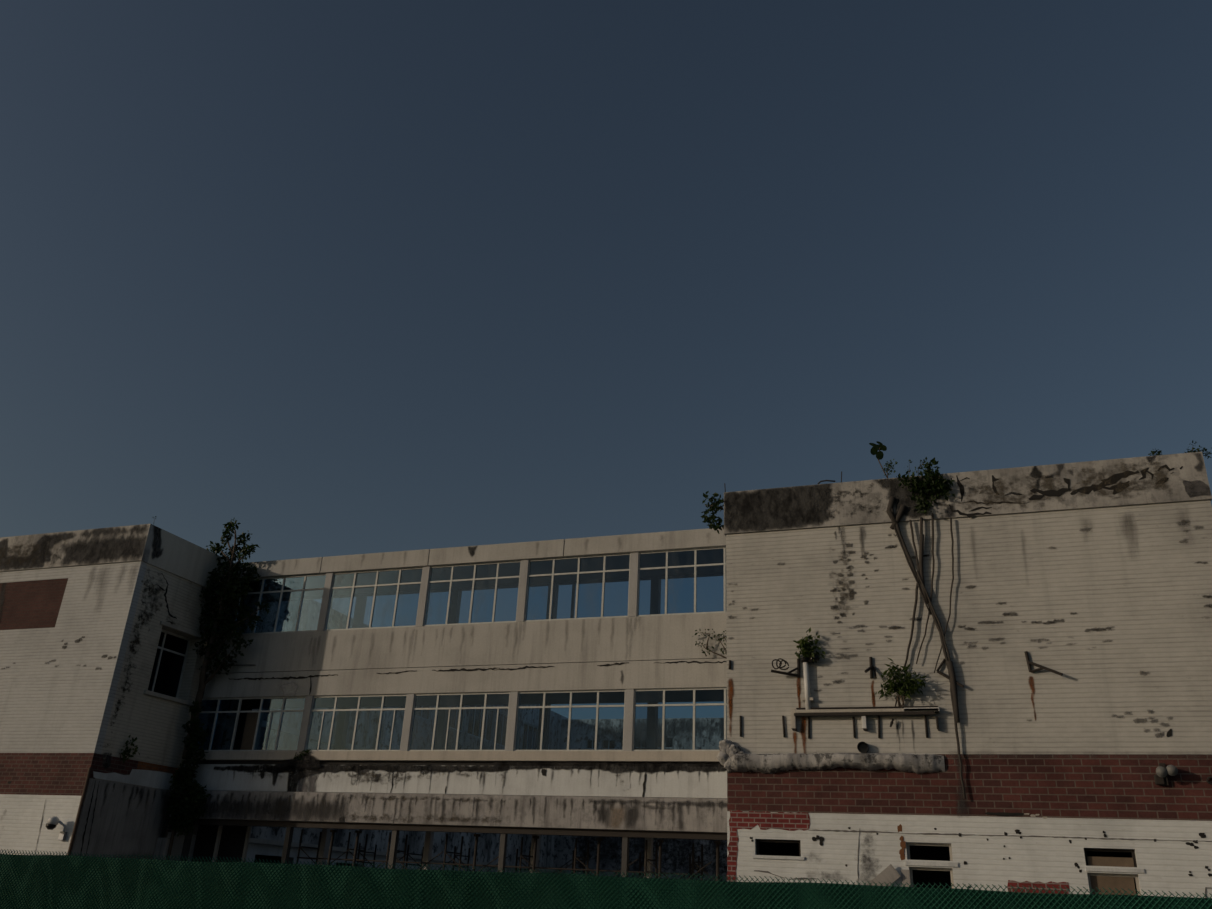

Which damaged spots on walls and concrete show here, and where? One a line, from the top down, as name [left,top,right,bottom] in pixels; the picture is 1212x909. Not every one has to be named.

water stain [936,456,1167,517]
crack [949,465,1183,518]
water stain [724,483,880,562]
water stain [0,524,163,617]
crack [229,674,336,695]
crack [377,666,554,674]
crack [597,659,727,667]
rust [793,677,806,753]
spalling [1113,710,1172,737]
water stain [206,708,727,849]